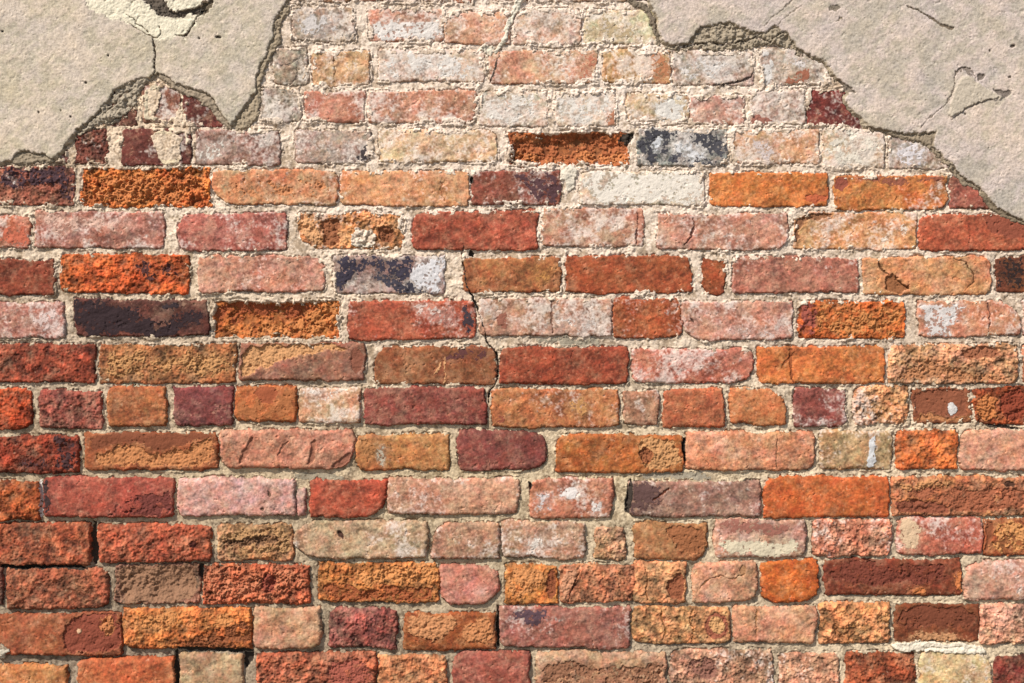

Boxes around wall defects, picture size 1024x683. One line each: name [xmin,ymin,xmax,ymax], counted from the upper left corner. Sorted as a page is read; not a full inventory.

spalling [78,0,290,136]
spalling [628,0,804,57]
crack [921,67,999,128]
spalling [795,126,1024,242]
spalling [106,301,365,419]
crack [461,246,499,402]
spalling [899,346,1024,422]
spalling [90,432,214,468]
spalling [637,436,682,471]
spalling [117,564,303,649]
spalling [323,565,493,645]
spalling [541,660,664,683]